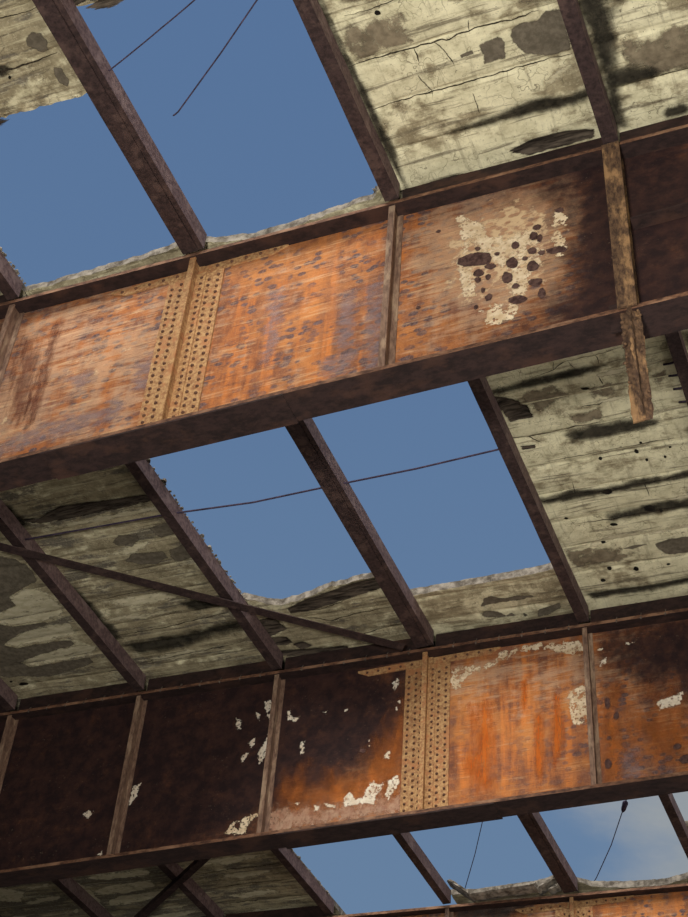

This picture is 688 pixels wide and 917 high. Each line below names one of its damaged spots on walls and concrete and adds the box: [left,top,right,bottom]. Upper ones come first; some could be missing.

damp [579,0,661,127]
damp [318,0,402,180]
damp [453,89,588,132]
peeling [455,212,568,328]
corrosion [457,224,567,310]
corrosion [12,332,58,422]
spalling [494,385,569,422]
damp [567,420,657,441]
damp [540,470,688,504]
spalling [288,579,380,614]
peeling [314,775,400,811]
peeling [225,813,258,835]